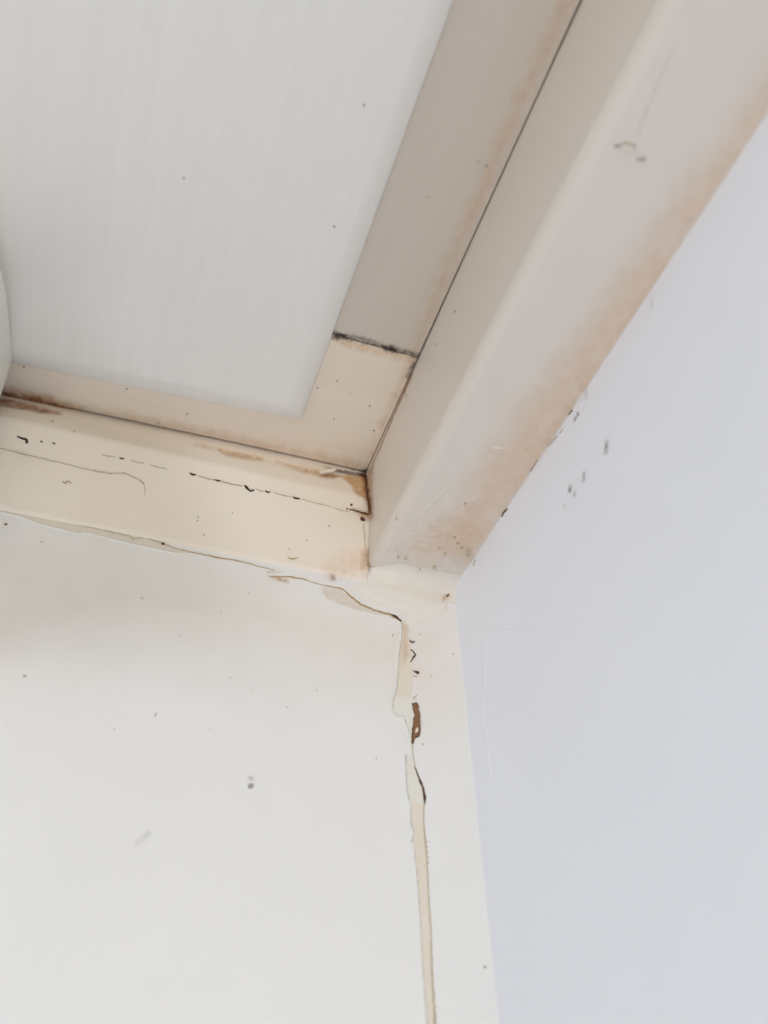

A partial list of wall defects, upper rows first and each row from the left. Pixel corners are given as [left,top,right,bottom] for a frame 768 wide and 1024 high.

crack [0,448,369,566]
crack [188,551,402,622]
peeling [391,621,434,1024]
crack [412,744,437,1024]